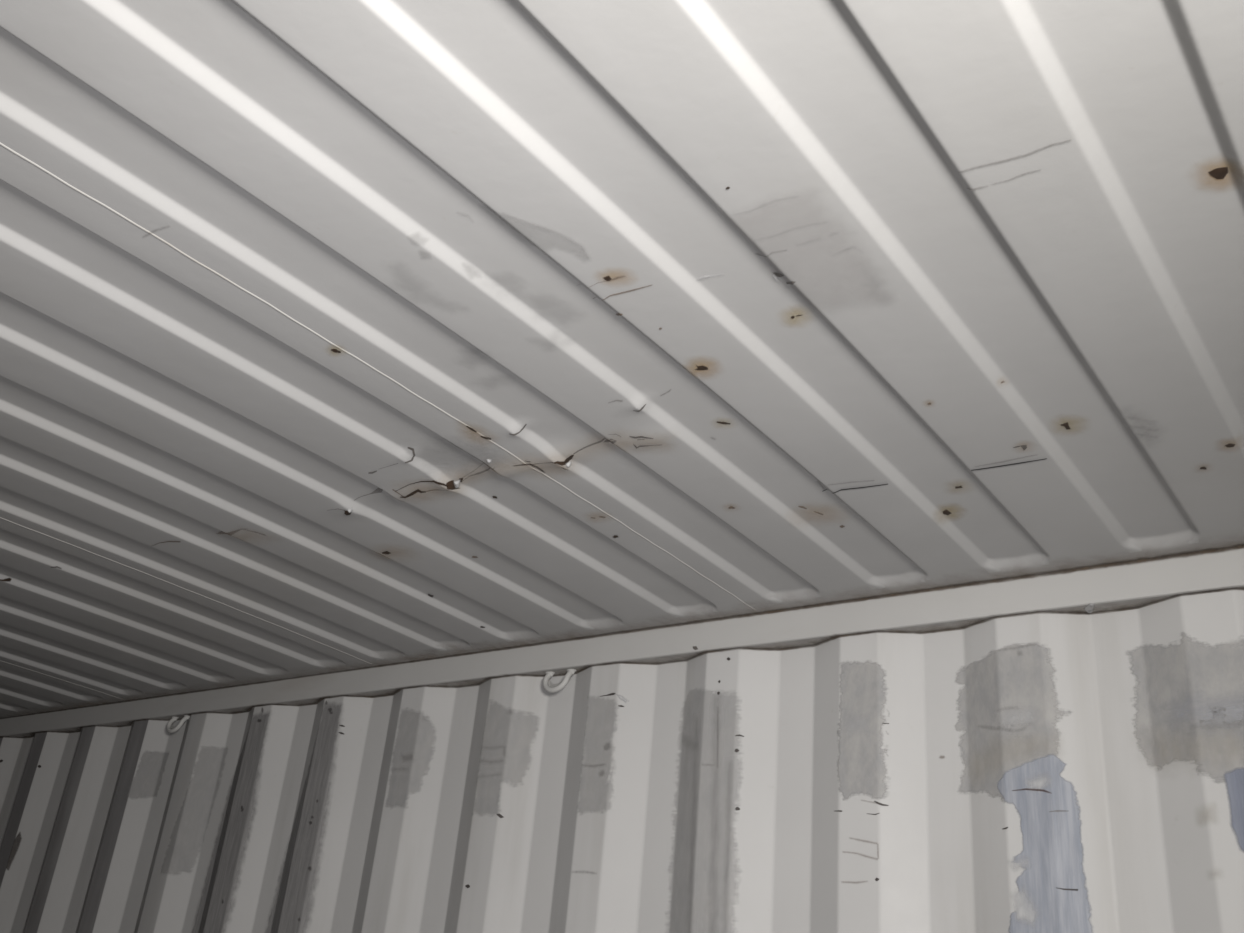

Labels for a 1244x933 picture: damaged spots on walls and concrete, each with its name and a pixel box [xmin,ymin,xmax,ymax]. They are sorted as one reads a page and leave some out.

corrosion [1209,164,1230,179]
crack [333,436,655,515]